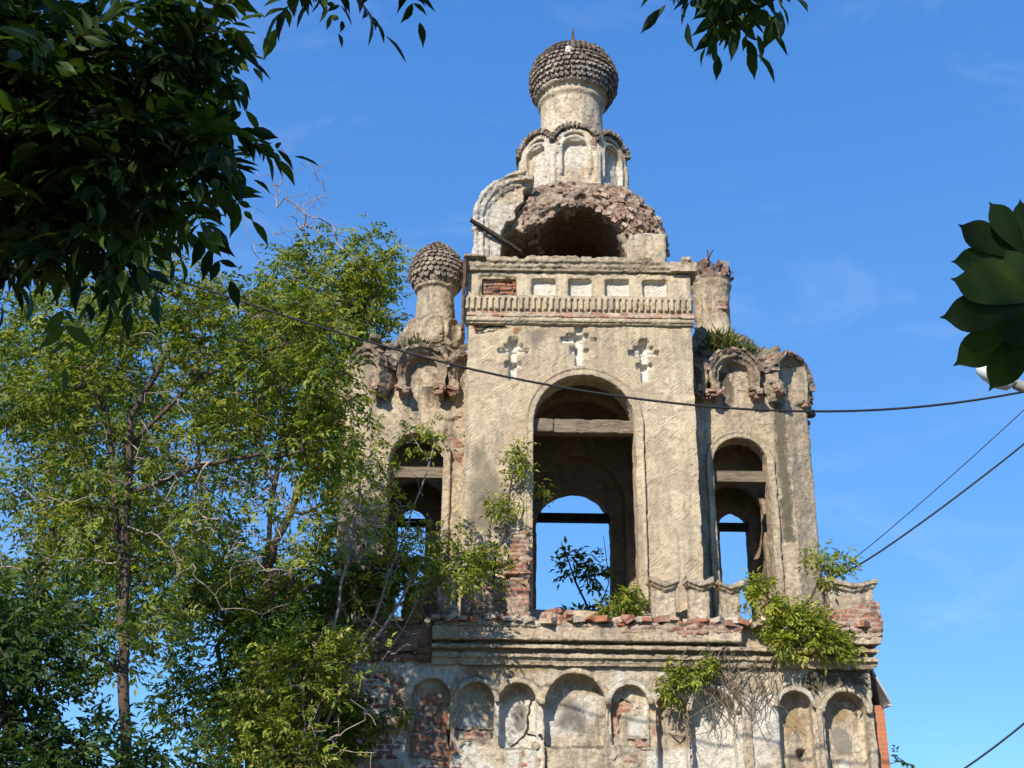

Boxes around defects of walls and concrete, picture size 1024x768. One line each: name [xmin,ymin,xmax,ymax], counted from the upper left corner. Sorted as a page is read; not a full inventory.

spalling [440,411,465,464]
flaking render [623,621,746,637]
flaking render [829,612,883,639]
spalling [327,665,493,768]
crack [448,699,548,768]
spalling [611,698,659,746]